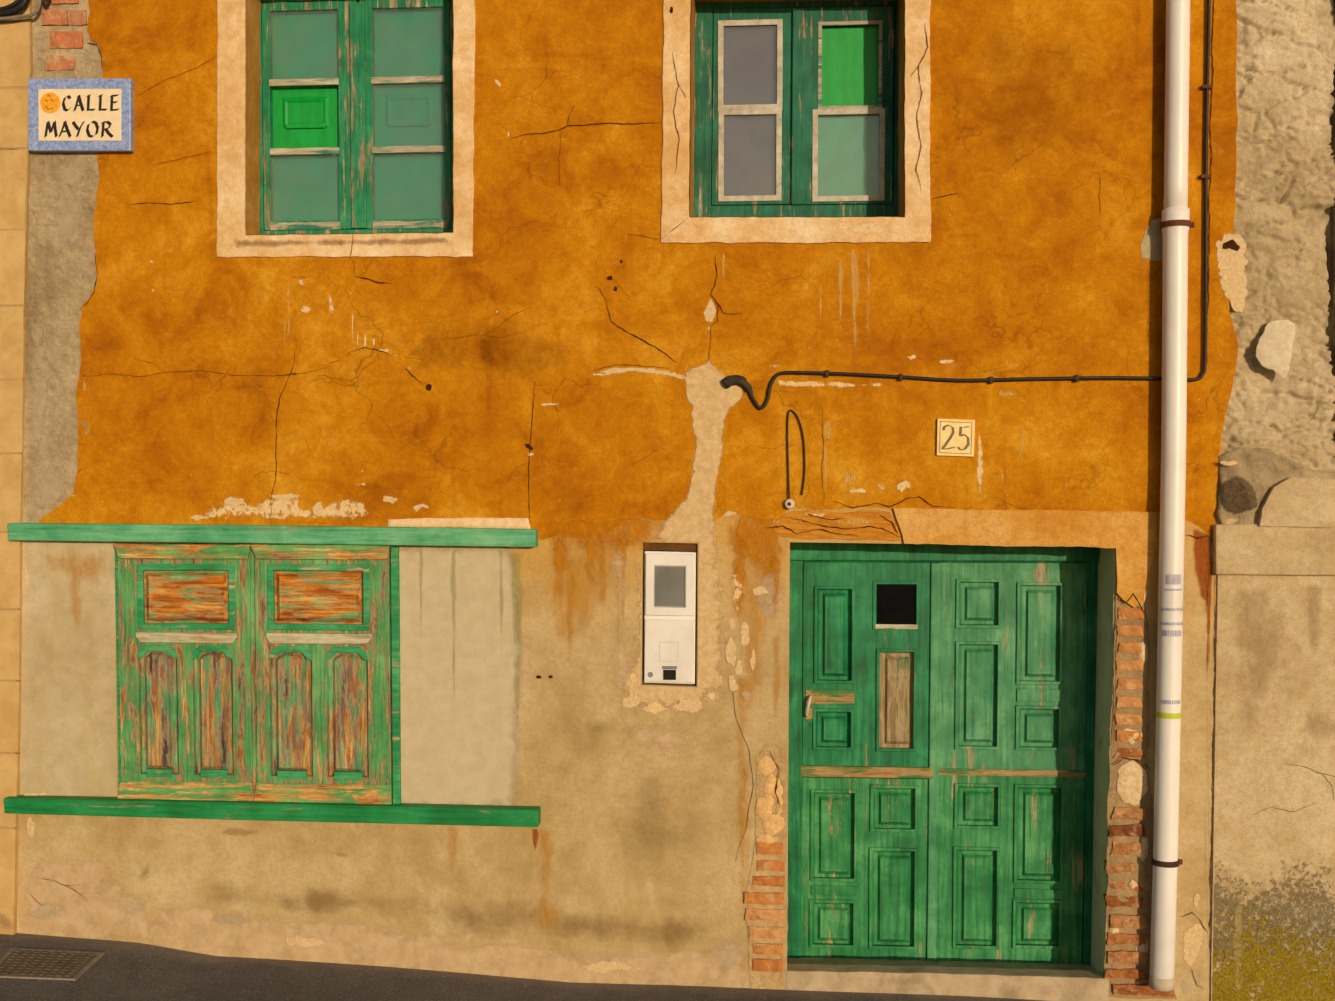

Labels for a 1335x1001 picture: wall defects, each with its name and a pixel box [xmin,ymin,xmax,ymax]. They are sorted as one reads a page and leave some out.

spalling [32,0,106,79]
crack [513,53,686,185]
spalling [22,152,101,523]
crack [350,236,391,284]
peeling [593,367,685,379]
crack [594,255,740,371]
spalling [1216,232,1248,312]
peeling [191,493,368,520]
spalling [1221,461,1258,513]
spalling [1103,589,1177,999]
spalling [744,744,788,990]
water stain [1213,861,1335,987]